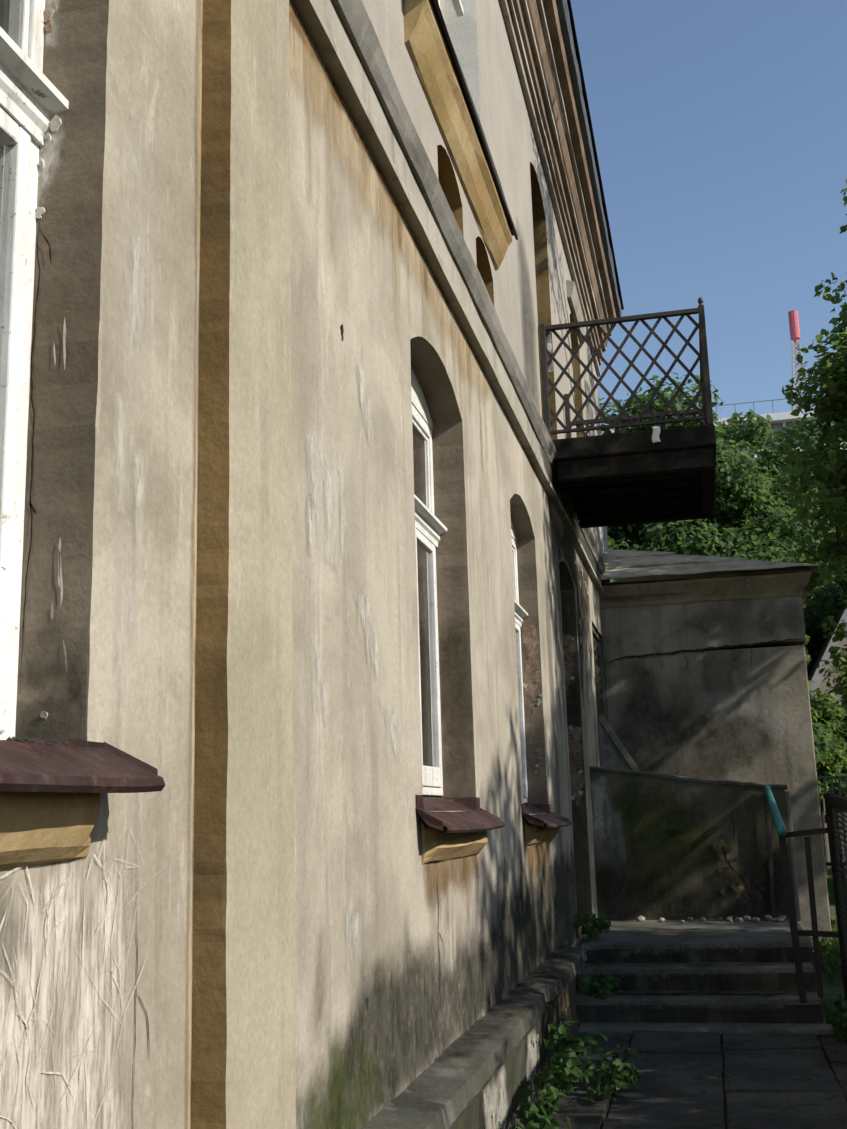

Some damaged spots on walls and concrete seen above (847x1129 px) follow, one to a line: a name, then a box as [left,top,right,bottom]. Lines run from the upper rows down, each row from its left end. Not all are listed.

flaking render [43,0,58,45]
crack [19,203,51,695]
flaking render [522,618,542,712]
flaking render [563,635,575,691]
crack [608,638,804,673]
leakage [298,440,788,1129]
flaking render [568,725,585,806]